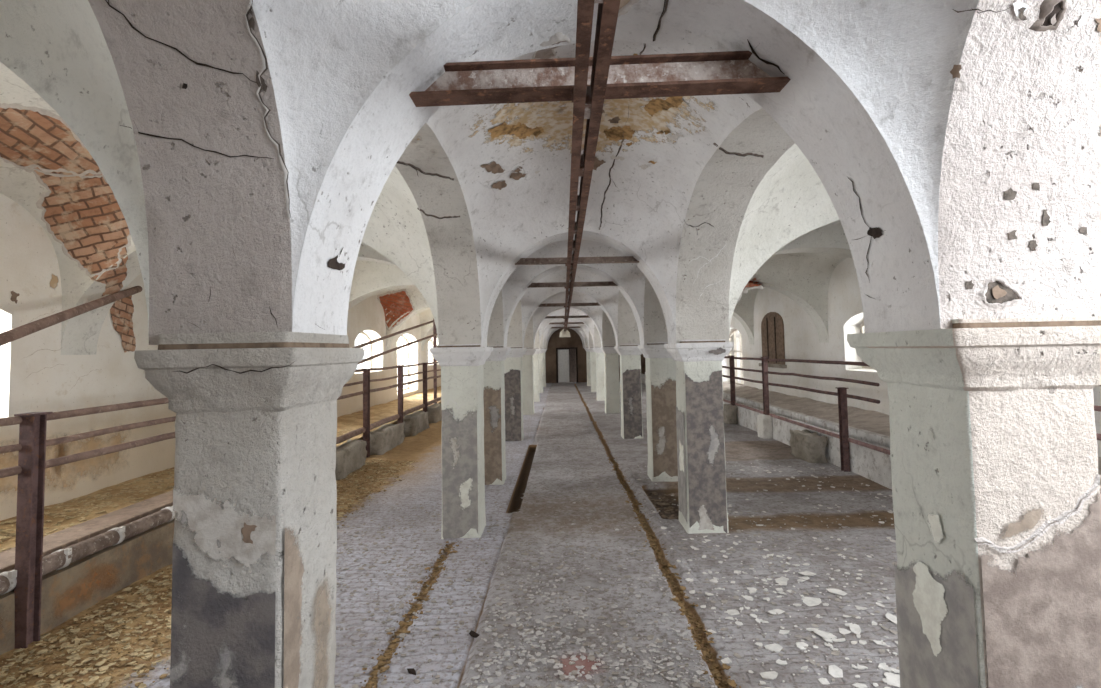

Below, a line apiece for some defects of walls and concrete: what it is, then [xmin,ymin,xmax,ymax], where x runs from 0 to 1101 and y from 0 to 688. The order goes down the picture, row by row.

crack [105,0,256,83]
crack [640,0,669,55]
spalling [952,0,1067,31]
crack [120,122,273,159]
water stain [481,161,540,190]
water stain [469,96,714,170]
flaking render [0,103,136,353]
crack [850,179,886,299]
spalling [966,275,1024,310]
water stain [623,369,687,522]
water stain [170,528,332,688]
peeling [894,474,1101,688]